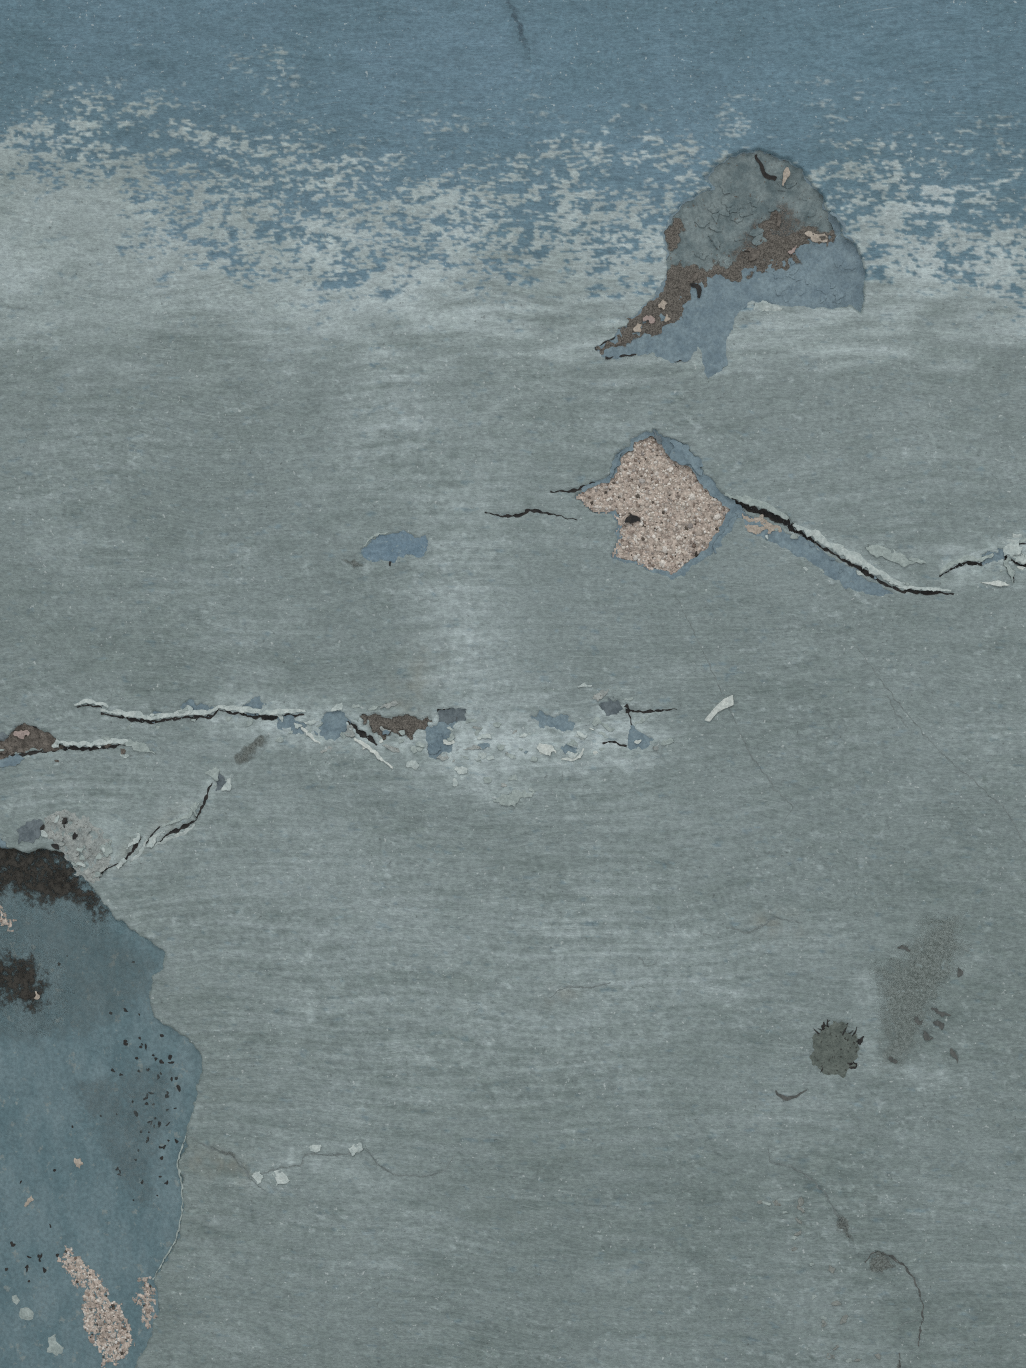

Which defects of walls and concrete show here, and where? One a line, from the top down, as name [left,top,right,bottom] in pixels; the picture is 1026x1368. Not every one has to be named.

peeling [594,150,865,379]
spalling [575,429,745,580]
crack [724,493,1026,596]
crack [0,683,677,874]
peeling [0,809,202,1368]
crack [186,1134,455,1191]
hole [809,1019,864,1078]
crack [757,1149,924,1368]